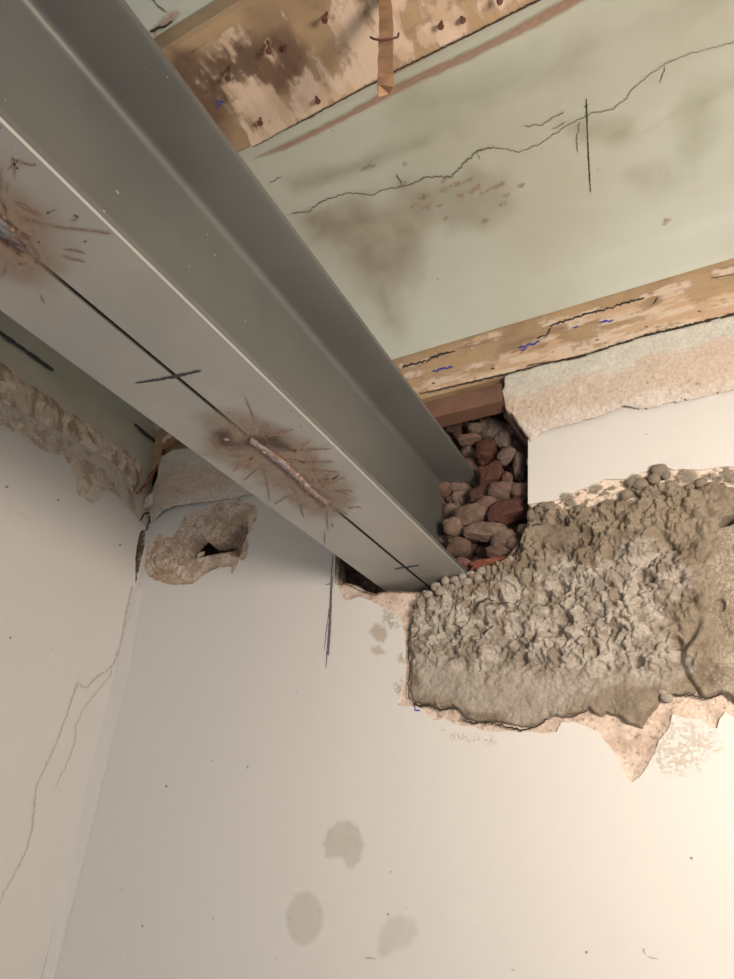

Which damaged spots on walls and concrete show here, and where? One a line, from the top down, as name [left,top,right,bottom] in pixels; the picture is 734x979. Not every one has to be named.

crack [292,41,734,214]
peeling [398,280,734,393]
peeling [711,267,734,278]
flaking render [0,362,153,520]
flaking render [144,498,259,585]
spalling [439,412,538,573]
flaking render [554,478,639,510]
flaking render [640,467,734,490]
crack [0,512,150,903]
flaking render [334,555,734,782]